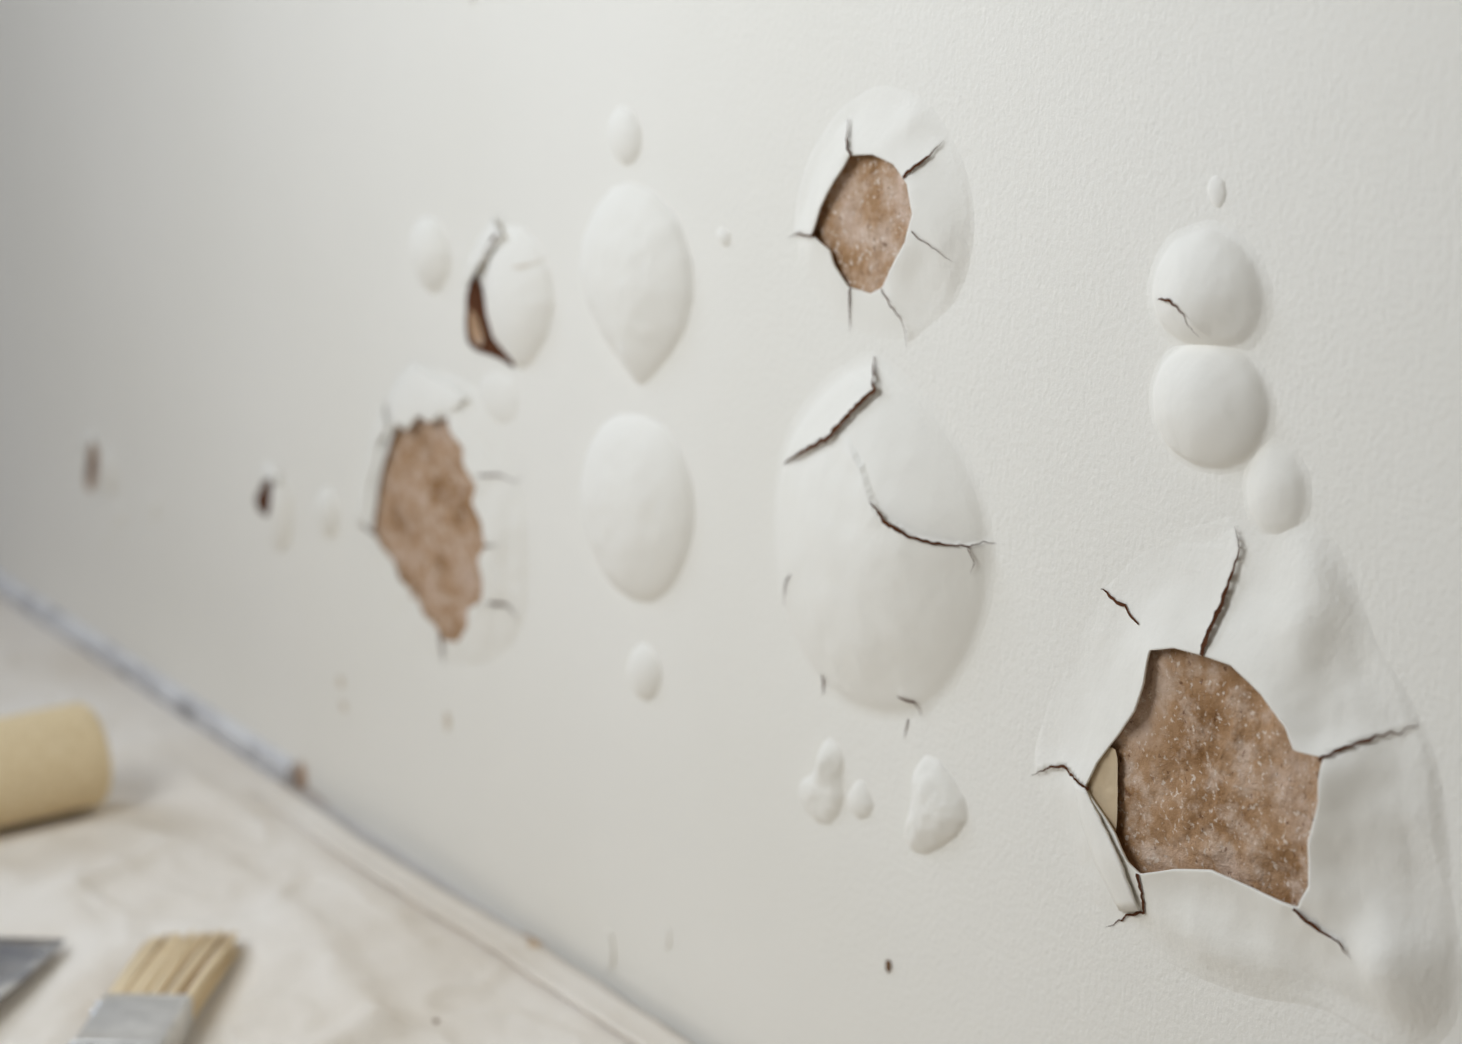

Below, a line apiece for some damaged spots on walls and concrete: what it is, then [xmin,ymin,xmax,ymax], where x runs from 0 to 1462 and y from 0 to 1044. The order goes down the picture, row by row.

peeling [788,85,974,343]
peeling [355,363,530,665]
peeling [1031,516,1462,1044]